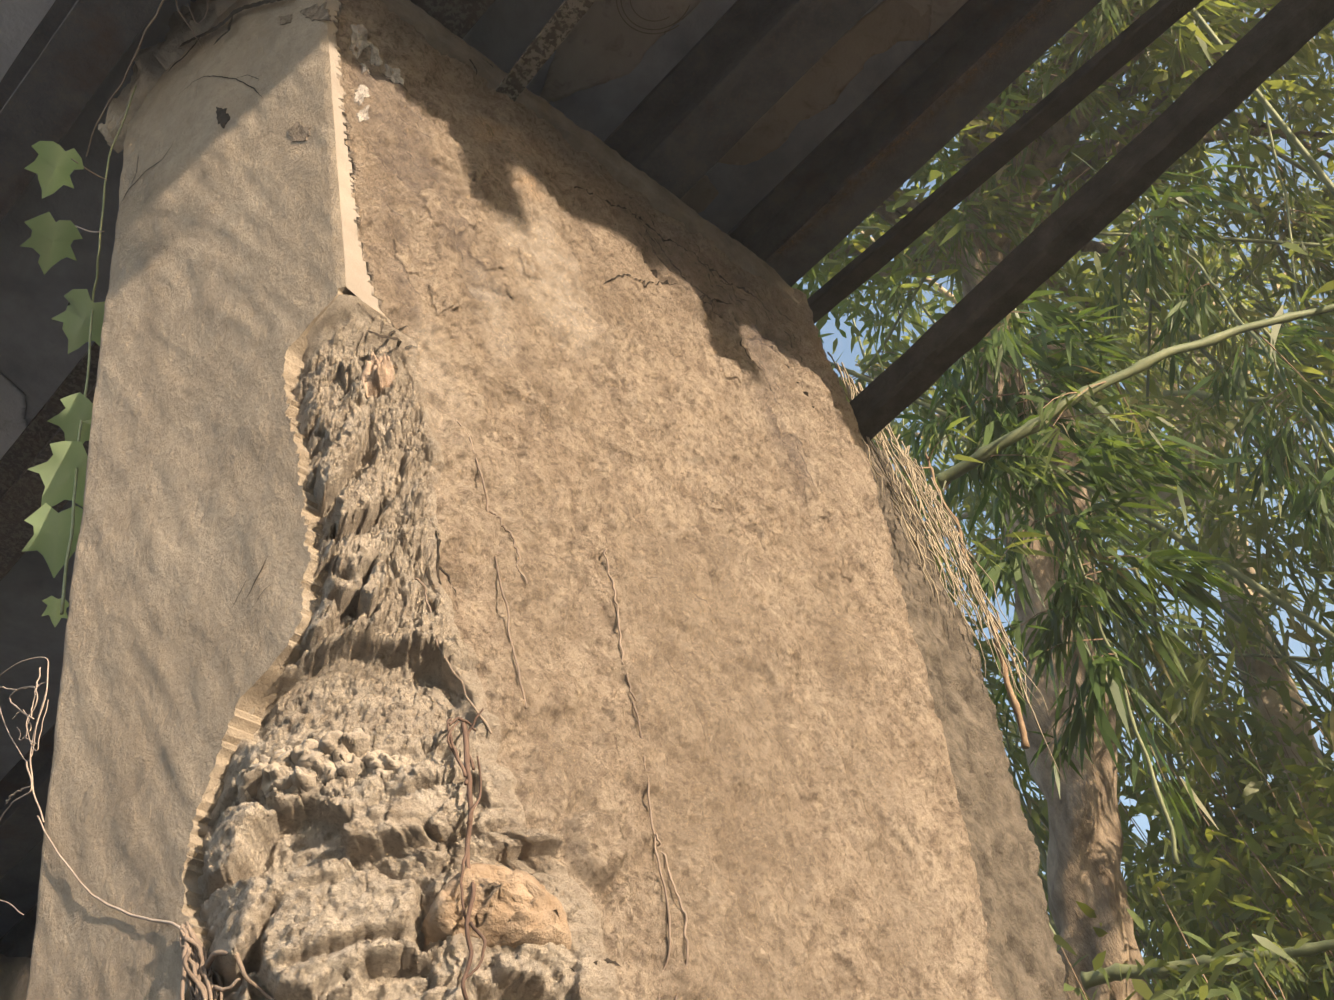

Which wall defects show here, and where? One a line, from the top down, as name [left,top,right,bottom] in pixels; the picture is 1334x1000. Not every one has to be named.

crack [169,0,282,97]
spalling [279,2,332,25]
peeling [349,24,405,122]
spalling [288,121,311,142]
spalling [198,295,619,1000]